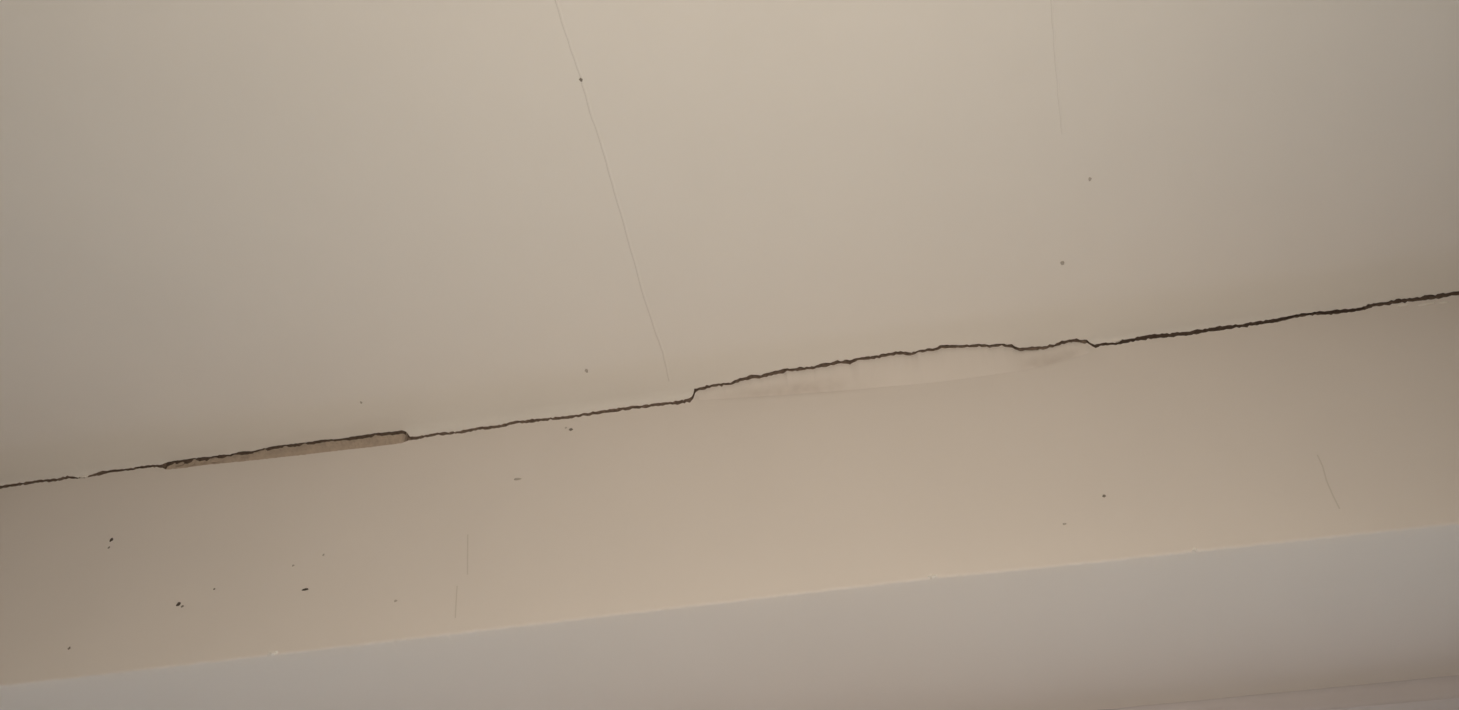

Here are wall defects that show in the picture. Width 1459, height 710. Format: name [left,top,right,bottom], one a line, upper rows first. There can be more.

crack [407,291,1459,441]
spalling [165,430,408,469]
crack [0,463,168,489]